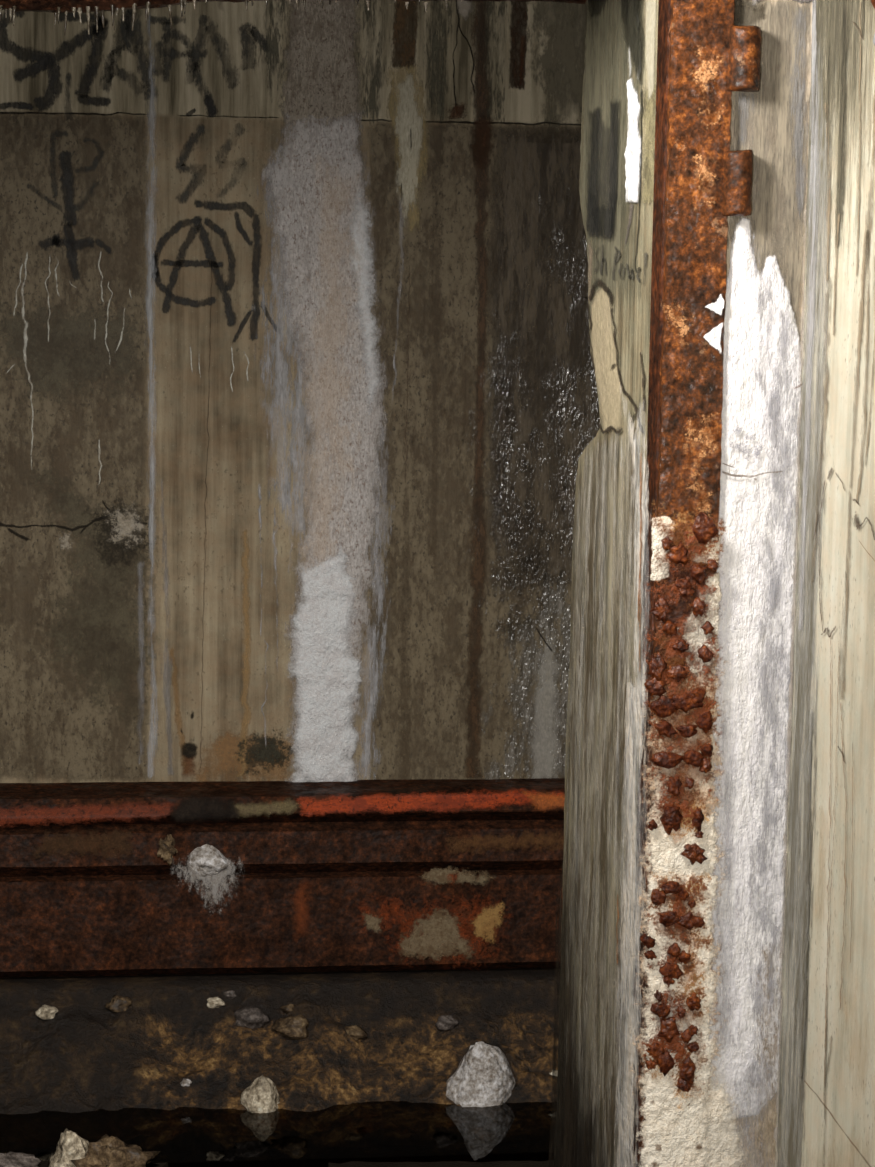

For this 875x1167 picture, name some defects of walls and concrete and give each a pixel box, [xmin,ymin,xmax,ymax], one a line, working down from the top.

corrosion [392,0,418,68]
corrosion [509,1,528,89]
corrosion [692,49,722,90]
corrosion [693,154,716,181]
corrosion [667,306,689,343]
crack [0,500,149,540]
spalling [90,500,151,570]
leakage [197,0,875,1167]
corrosion [637,414,725,1109]
corrosion [446,830,564,854]
crack [804,468,875,1166]